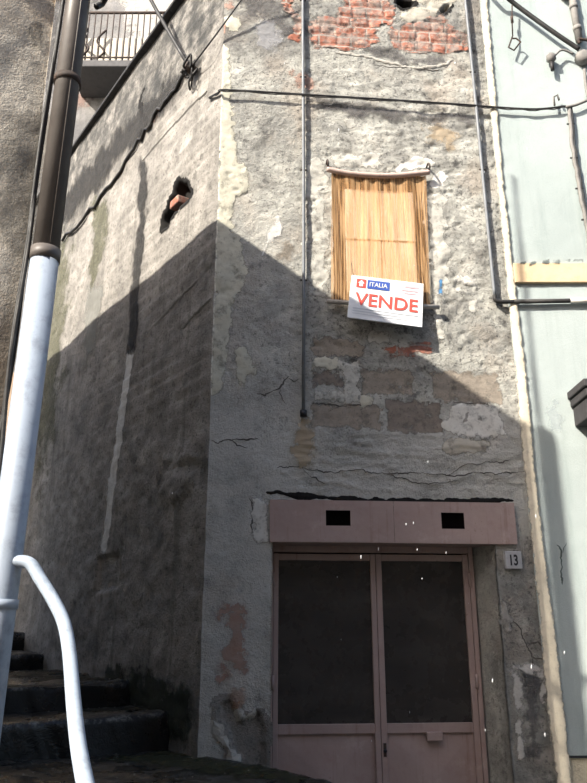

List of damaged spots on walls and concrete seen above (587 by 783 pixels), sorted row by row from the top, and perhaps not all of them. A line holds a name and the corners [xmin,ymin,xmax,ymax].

spalling [280,0,469,55]
flaking render [211,44,257,396]
flaking render [300,152,383,298]
flaking render [311,156,508,456]
crack [257,376,298,403]
crack [212,438,258,448]
crack [249,460,525,532]
crack [557,545,566,584]
crack [513,621,543,677]
spalling [210,693,273,768]
water stain [511,664,547,759]